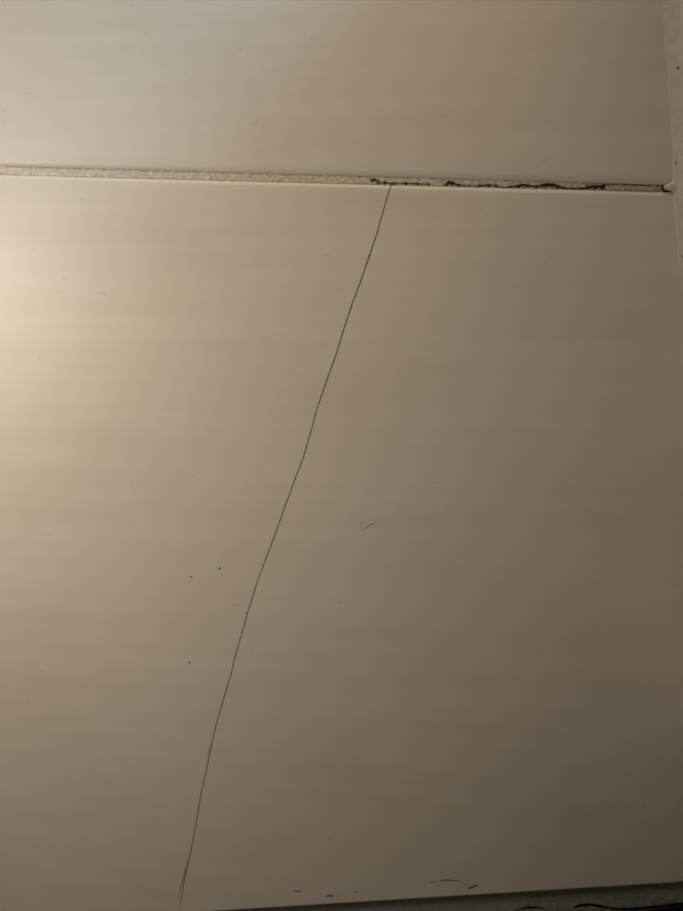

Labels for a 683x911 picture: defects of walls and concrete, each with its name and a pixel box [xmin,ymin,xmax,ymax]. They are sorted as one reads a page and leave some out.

crack [447,181,608,190]
crack [177,179,425,907]
crack [573,903,683,911]